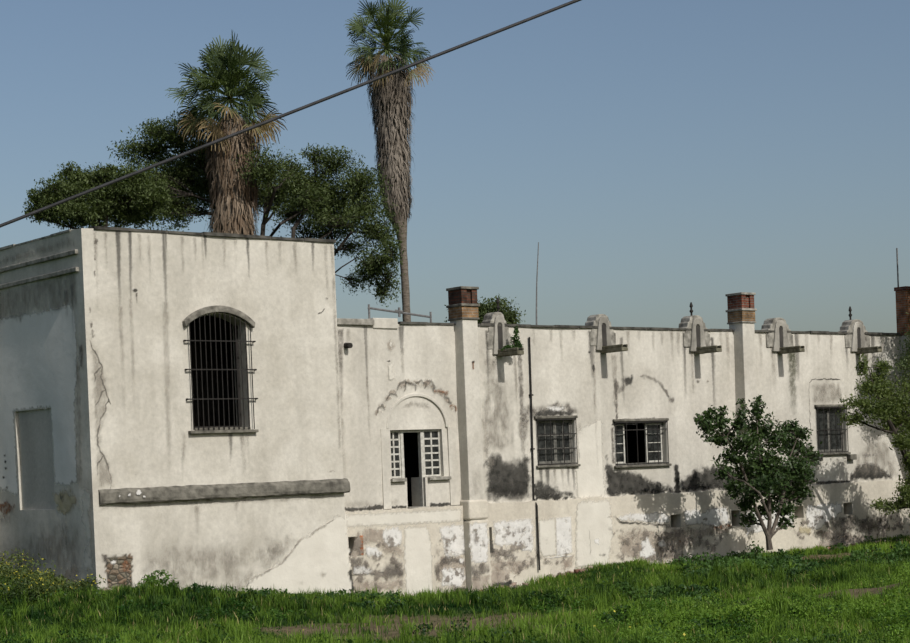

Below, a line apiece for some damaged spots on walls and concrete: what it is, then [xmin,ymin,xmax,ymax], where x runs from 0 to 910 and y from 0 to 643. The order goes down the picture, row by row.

damp [116,231,131,260]
crack [91,345,111,404]
spalling [376,360,457,415]
damp [606,375,745,496]
damp [487,455,573,501]
peeling [54,482,94,573]
spalling [103,554,133,589]
spalling [348,527,403,594]
spalling [614,507,731,560]
spalling [746,503,904,547]